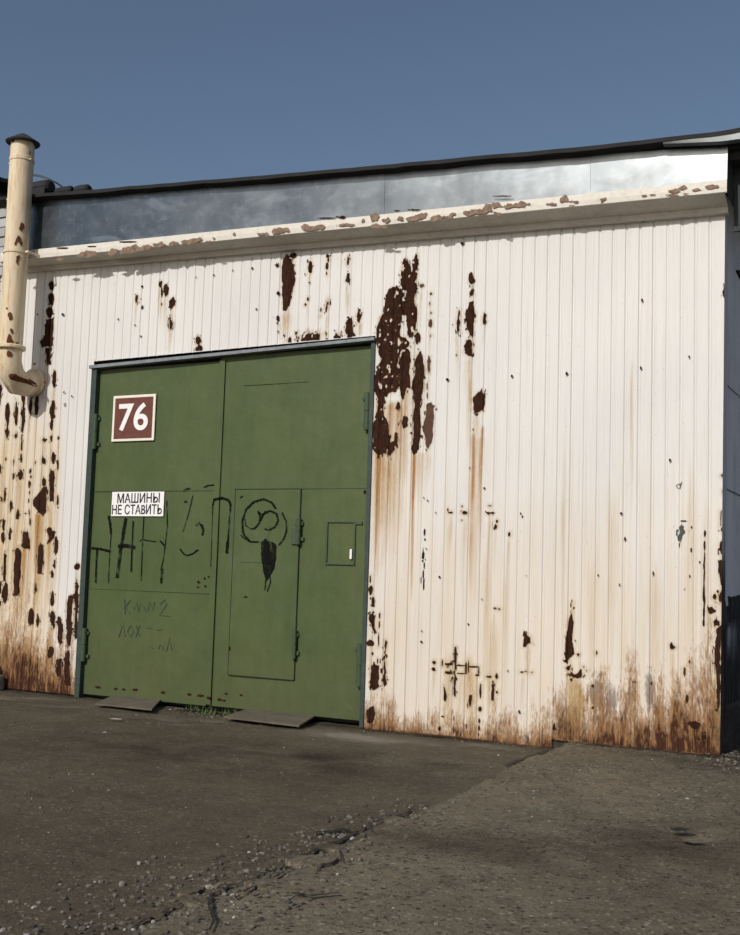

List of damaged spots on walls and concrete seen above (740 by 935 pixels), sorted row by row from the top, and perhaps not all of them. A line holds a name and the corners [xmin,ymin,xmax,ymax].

peeling [76,237,215,258]
peeling [257,227,289,236]
peeling [336,201,530,229]
peeling [642,184,719,197]
corrosion [37,281,72,397]
corrosion [273,253,364,342]
corrosion [452,272,486,357]
corrosion [363,253,437,590]
corrosion [469,388,486,418]
corrosion [0,384,80,695]
corrosion [364,516,722,756]
crack [207,808,414,930]